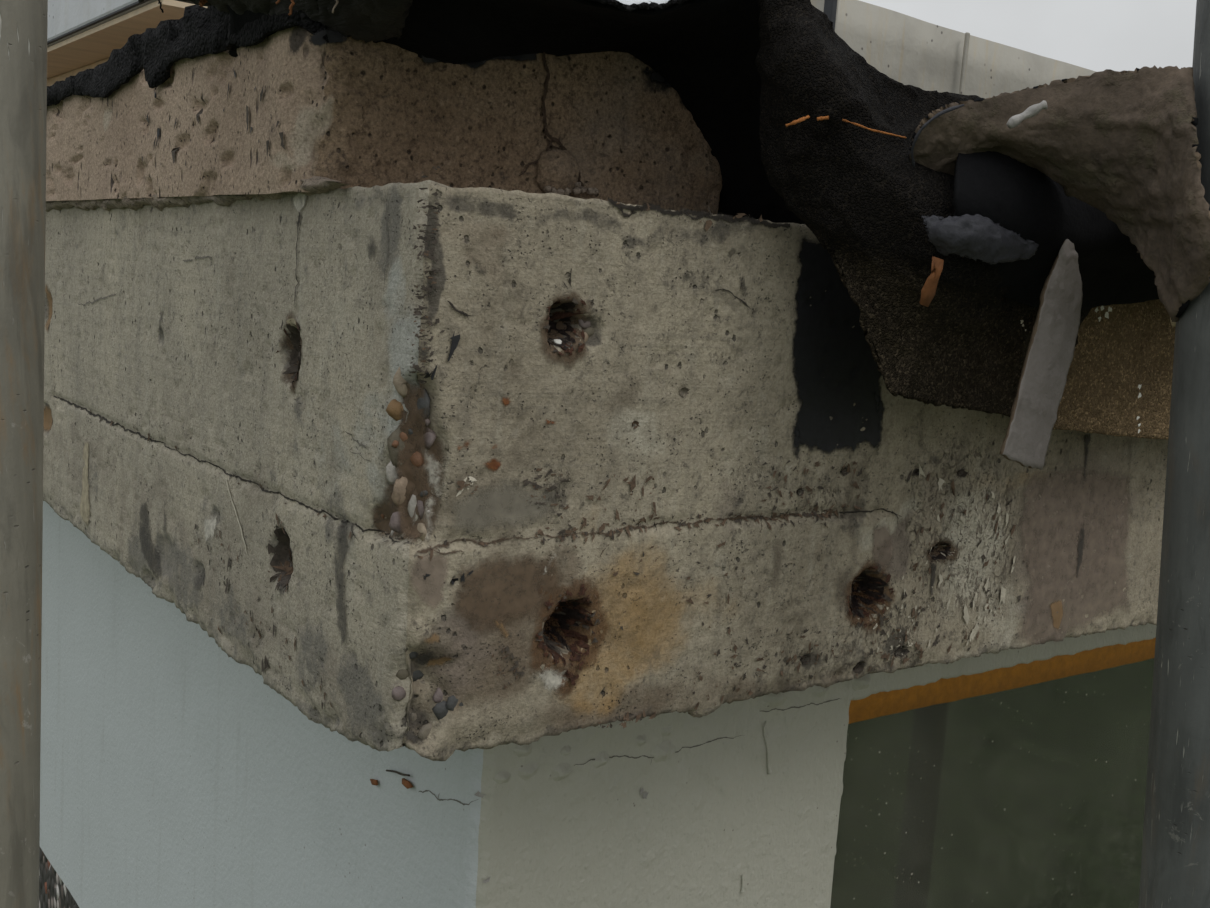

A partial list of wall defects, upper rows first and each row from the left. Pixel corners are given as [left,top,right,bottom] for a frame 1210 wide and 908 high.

crack [519,52,790,232]
spalling [373,331,460,541]
peeling [456,476,478,497]
crack [53,396,902,562]
peeling [238,597,322,673]
water stain [413,556,447,605]
water stain [456,556,560,630]
rust [535,584,600,685]
peeling [602,460,1021,718]